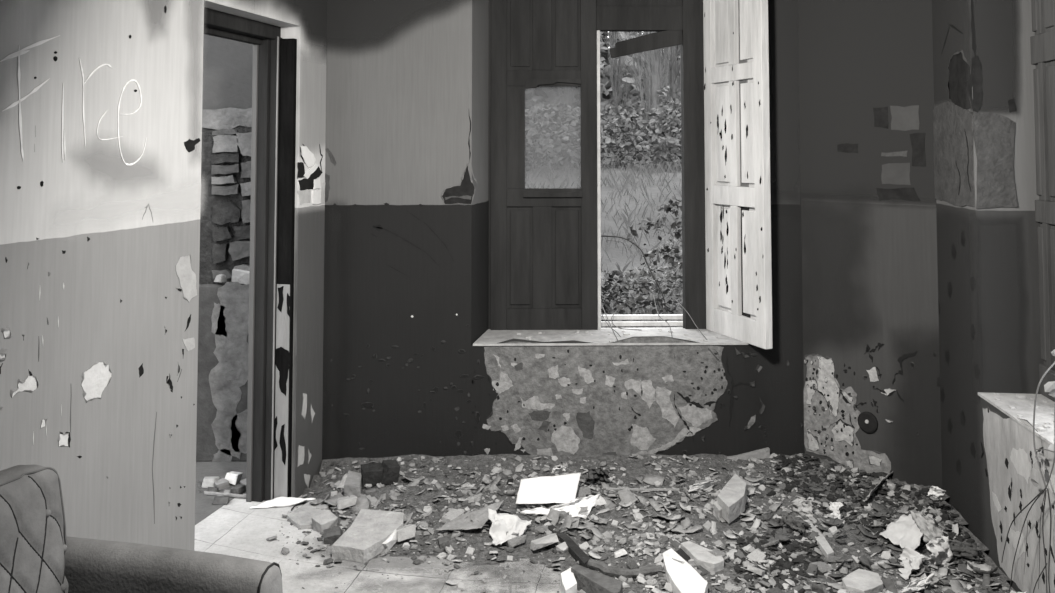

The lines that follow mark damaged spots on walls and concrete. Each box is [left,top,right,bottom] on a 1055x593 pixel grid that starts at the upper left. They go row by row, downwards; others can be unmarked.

peeling [165,254,198,302]
peeling [0,326,25,374]
peeling [0,369,39,410]
peeling [81,361,112,403]
peeling [166,315,195,398]
peeling [209,282,249,462]
peeling [477,336,765,456]
peeling [803,354,896,475]
peeling [57,432,82,458]